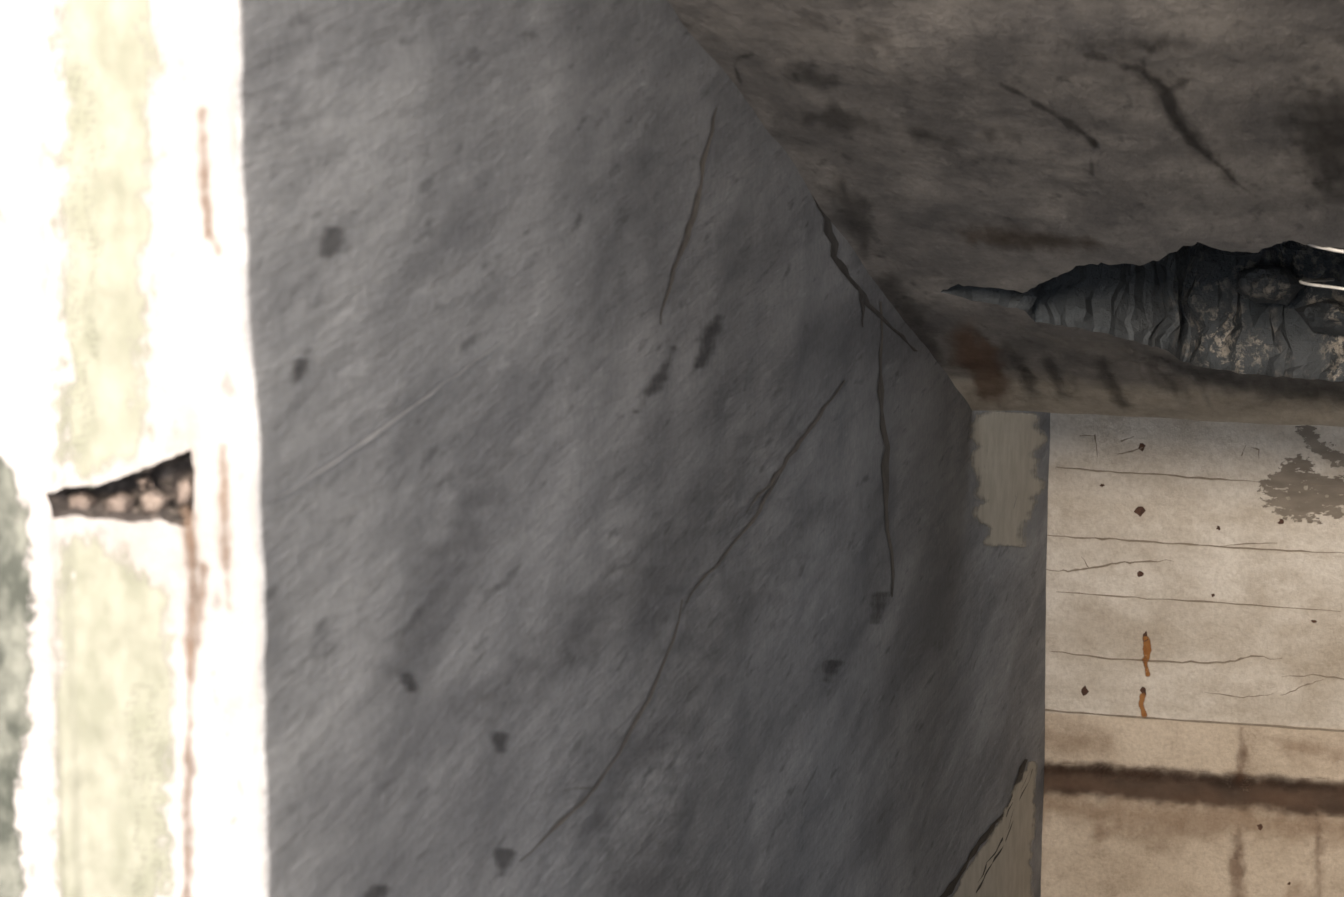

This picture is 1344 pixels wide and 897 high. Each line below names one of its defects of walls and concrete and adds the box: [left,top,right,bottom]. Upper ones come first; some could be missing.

spalling [941,240,1344,382]
peeling [1257,425,1344,524]
corrosion [1142,636,1151,677]
corrosion [1139,693,1147,718]
water stain [1044,765,1344,815]